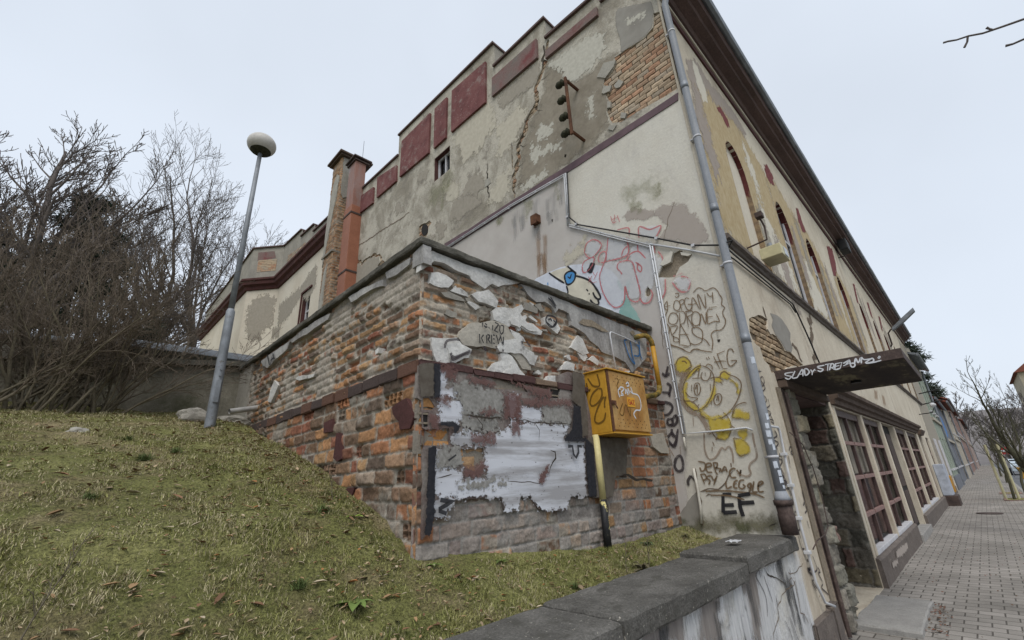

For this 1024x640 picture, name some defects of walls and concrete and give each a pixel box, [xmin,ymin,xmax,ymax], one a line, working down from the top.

crack [485,41,549,206]
peeling [348,6,940,538]